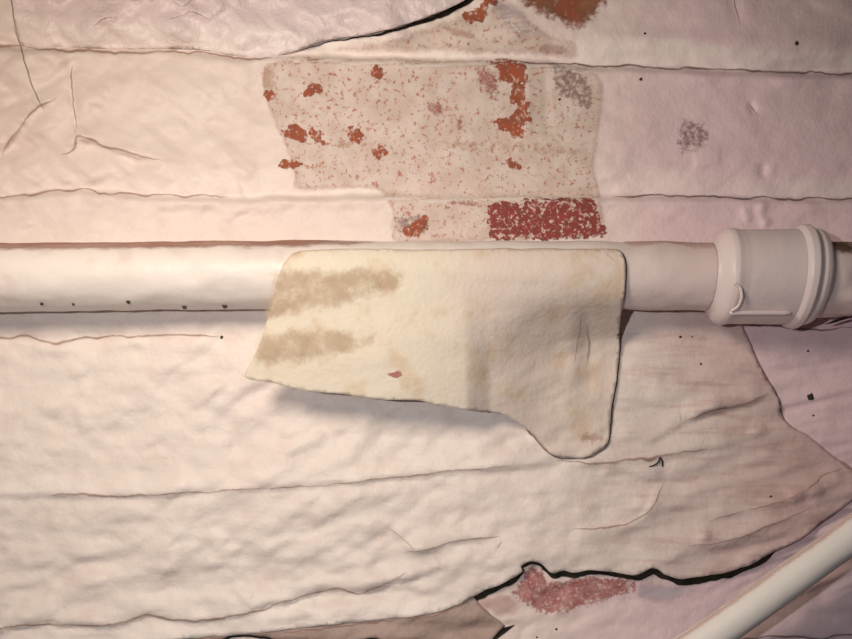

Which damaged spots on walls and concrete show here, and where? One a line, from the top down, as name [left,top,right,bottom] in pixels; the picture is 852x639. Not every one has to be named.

crack [0,0,260,157]
spalling [11,0,607,242]
peeling [0,248,852,639]